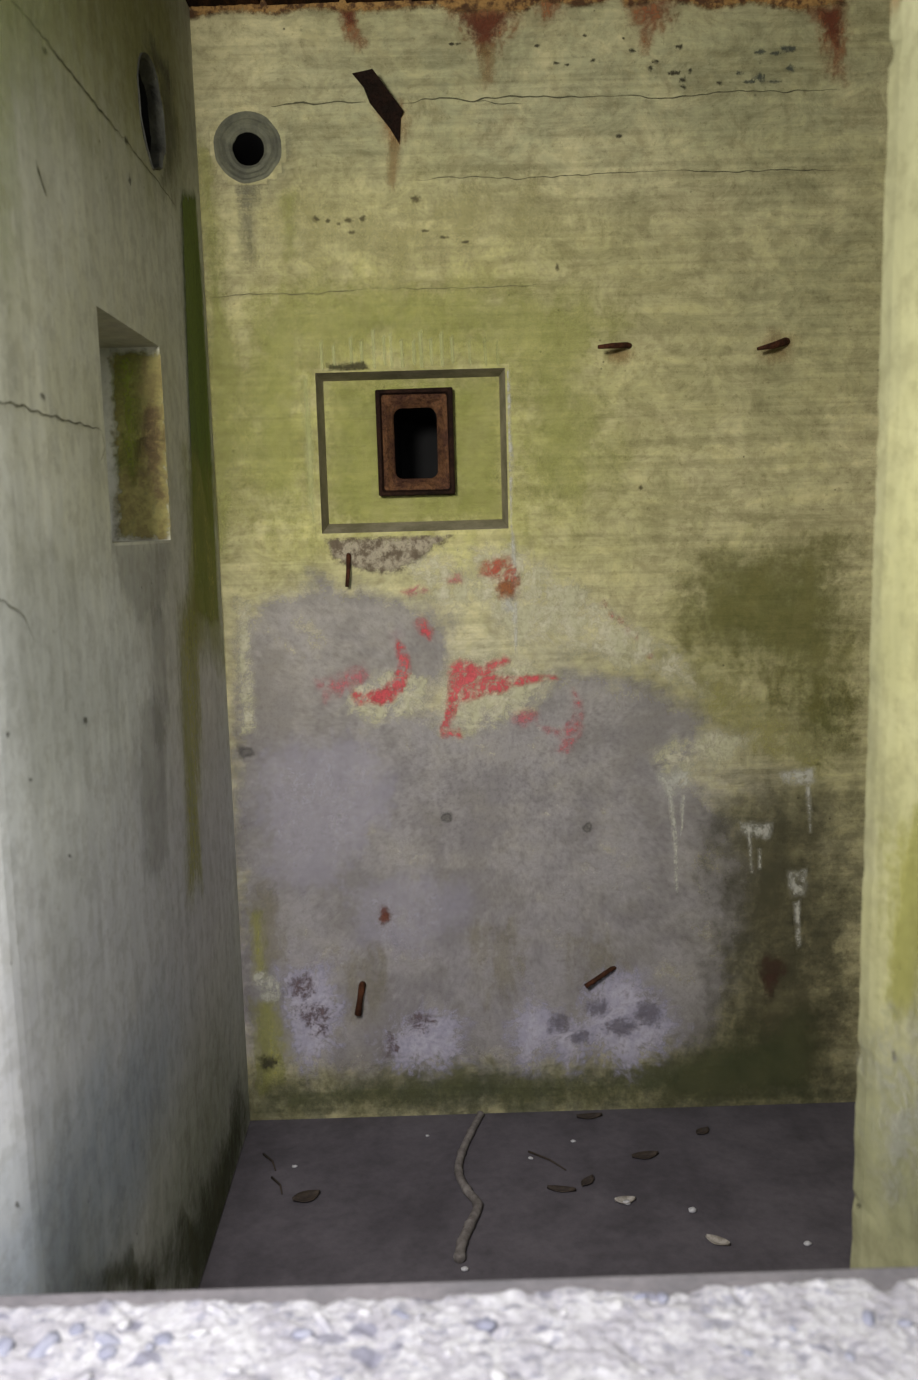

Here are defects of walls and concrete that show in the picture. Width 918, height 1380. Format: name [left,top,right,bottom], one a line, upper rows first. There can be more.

rust [340,9,362,46]
rust [451,8,516,49]
rust [808,4,845,76]
crack [271,100,360,108]
crack [402,89,829,105]
water stain [181,194,219,884]
spalling [328,534,450,573]
water stain [234,578,840,1092]
water stain [891,811,918,1017]
flaking render [253,965,349,1071]